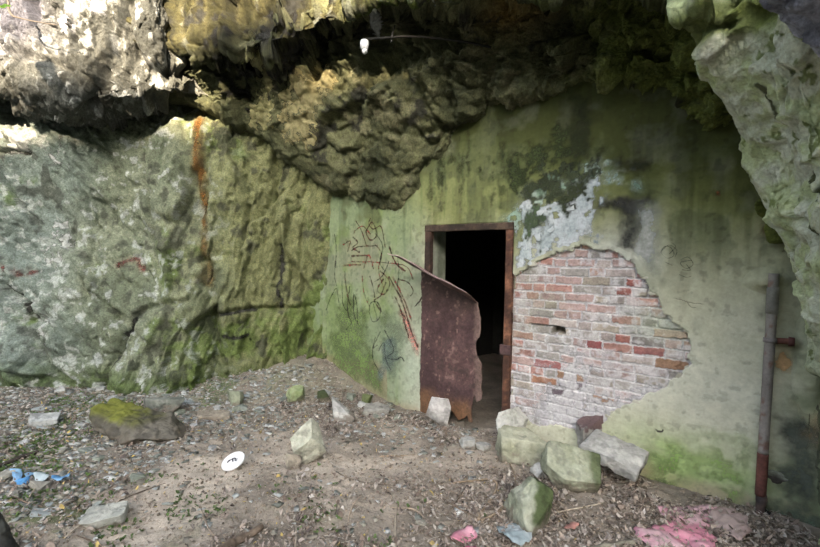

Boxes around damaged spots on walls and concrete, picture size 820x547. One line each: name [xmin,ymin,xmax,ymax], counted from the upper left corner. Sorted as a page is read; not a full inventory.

leakage [427,155,482,198]
leakage [490,98,604,241]
leakage [620,205,655,263]
flaking render [507,163,692,430]
rust [755,451,769,498]